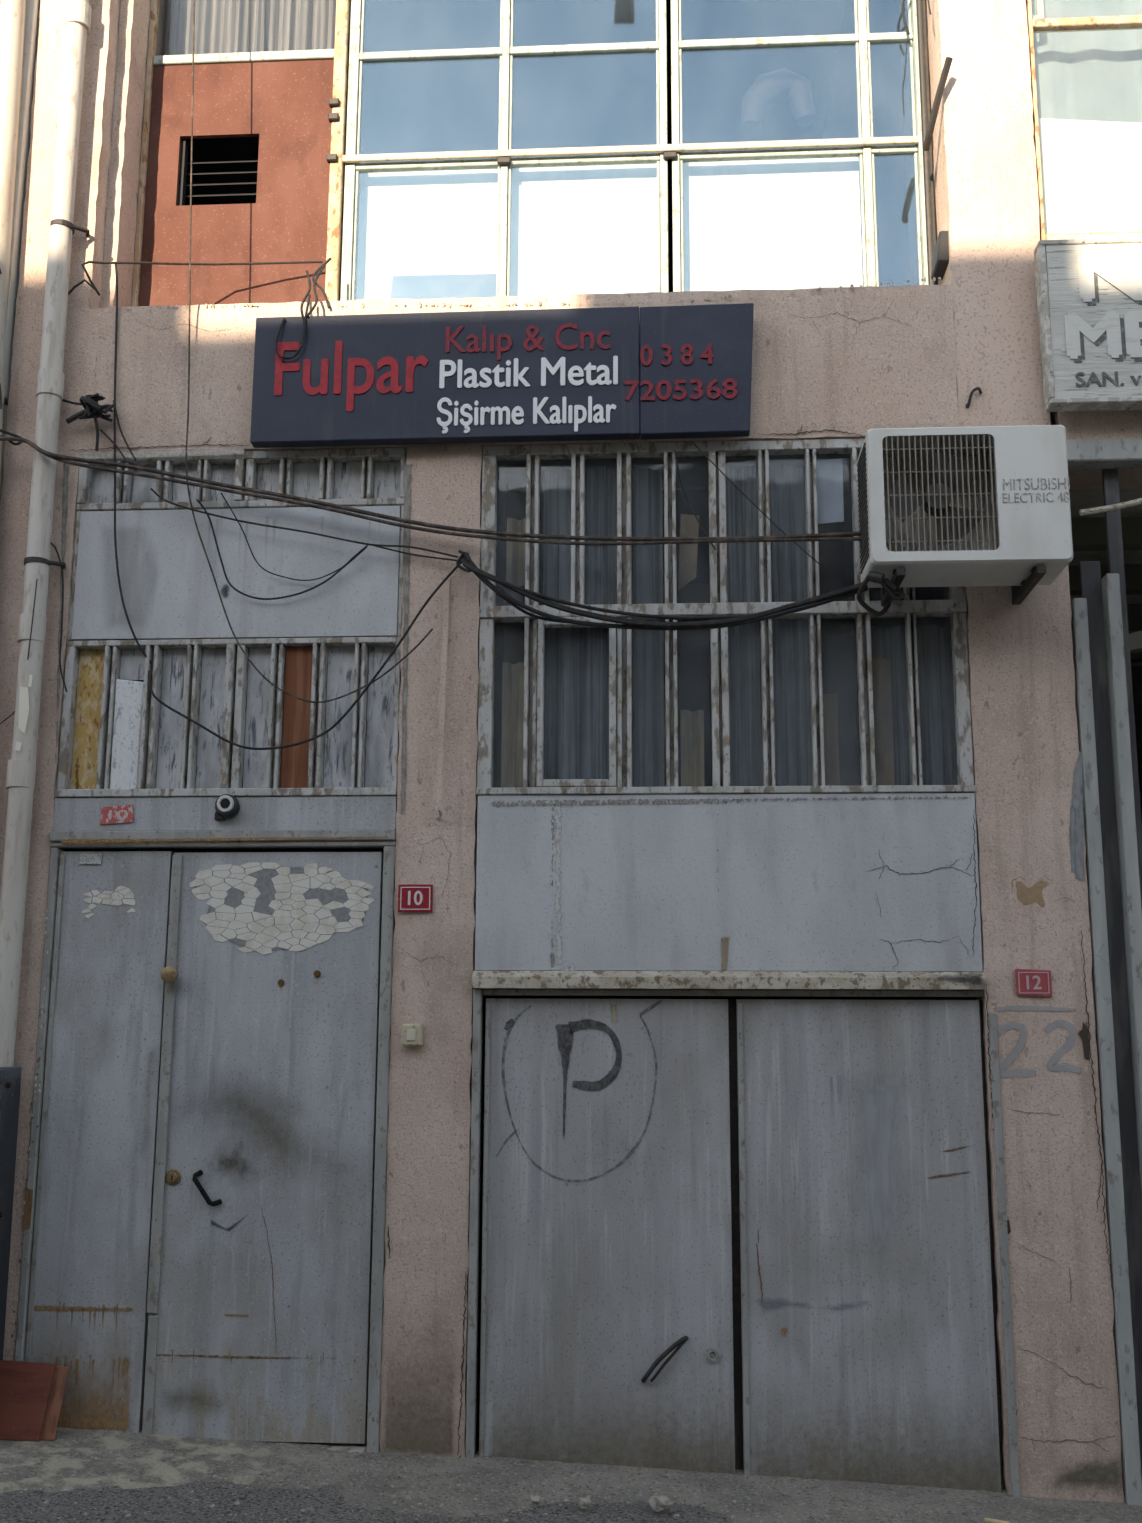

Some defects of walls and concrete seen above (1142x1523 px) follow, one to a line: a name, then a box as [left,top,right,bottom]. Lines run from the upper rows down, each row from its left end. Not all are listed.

crack [867,809,1114,1296]
crack [1009,1239,1072,1311]
rust [34,1302,131,1327]
rust [156,1350,291,1359]
rust [55,1356,129,1431]